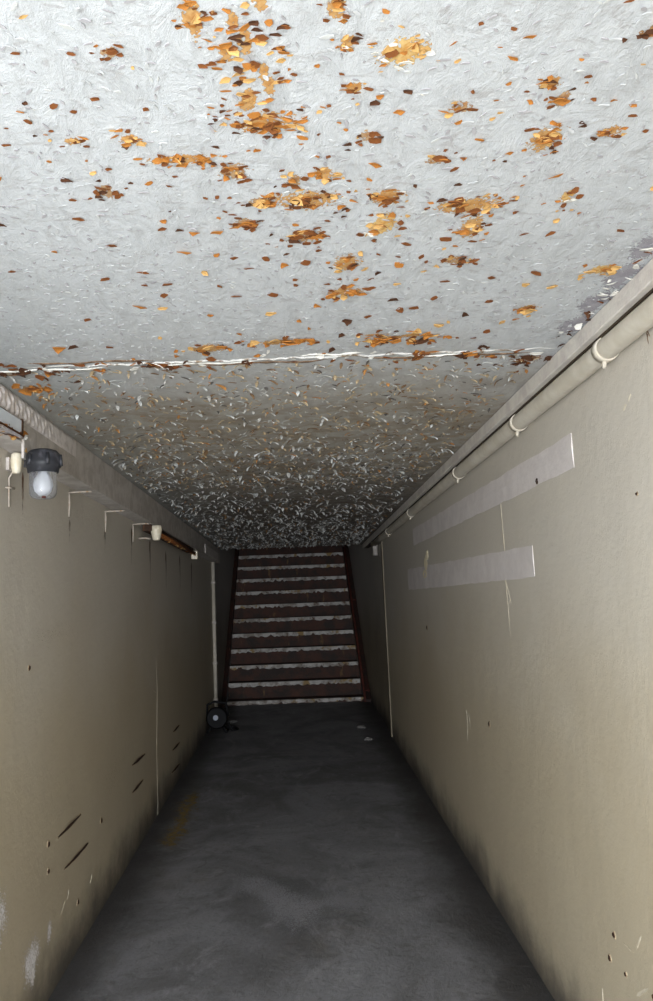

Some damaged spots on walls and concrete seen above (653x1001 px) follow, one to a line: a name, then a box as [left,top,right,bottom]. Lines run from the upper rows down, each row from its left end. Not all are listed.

peeling [0,0,653,550]